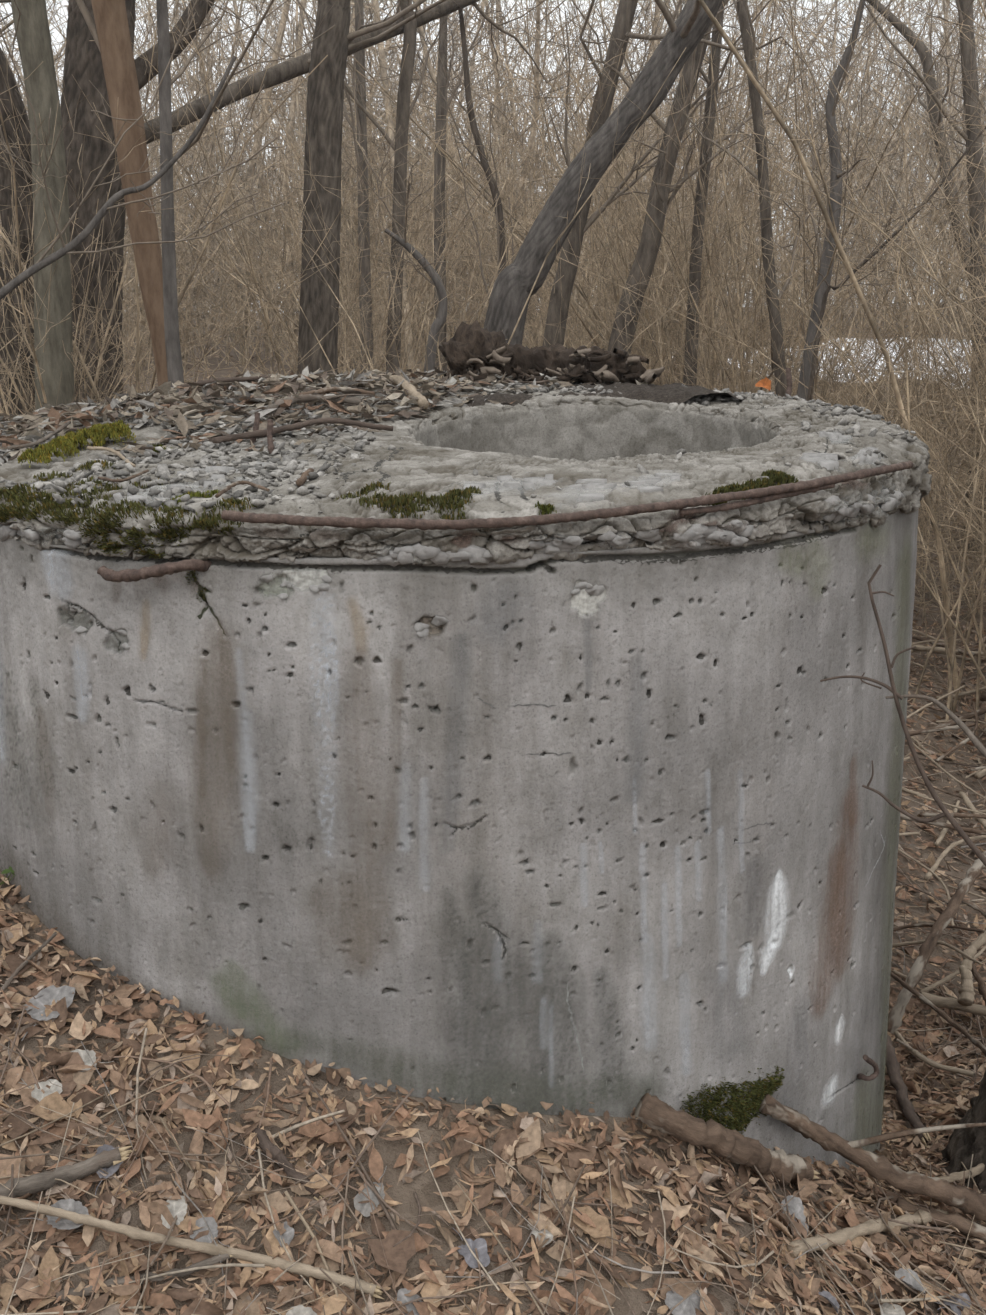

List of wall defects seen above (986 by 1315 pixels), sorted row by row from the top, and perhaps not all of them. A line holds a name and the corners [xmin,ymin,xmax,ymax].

rust [659,513,717,533]
spalling [44,595,93,639]
spalling [571,581,617,633]
spalling [106,629,130,653]
water stain [762,872,786,973]